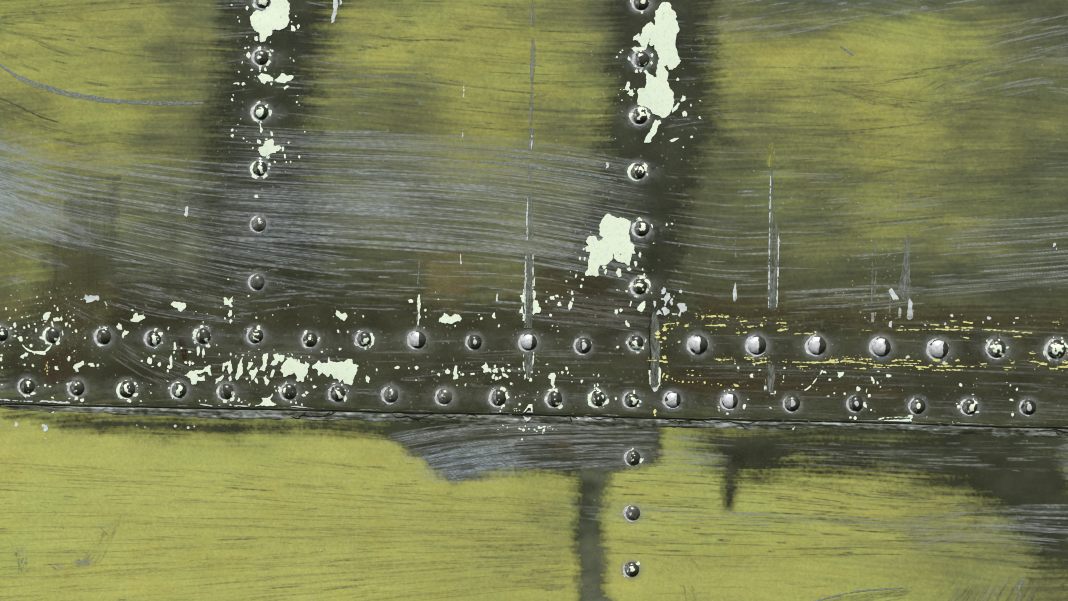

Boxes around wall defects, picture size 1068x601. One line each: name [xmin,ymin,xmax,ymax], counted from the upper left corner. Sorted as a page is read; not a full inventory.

peeling [231,0,300,103]
peeling [616,1,701,143]
peeling [0,292,145,413]
peeling [141,301,378,408]
peeling [519,214,987,426]
peeling [885,314,1032,417]